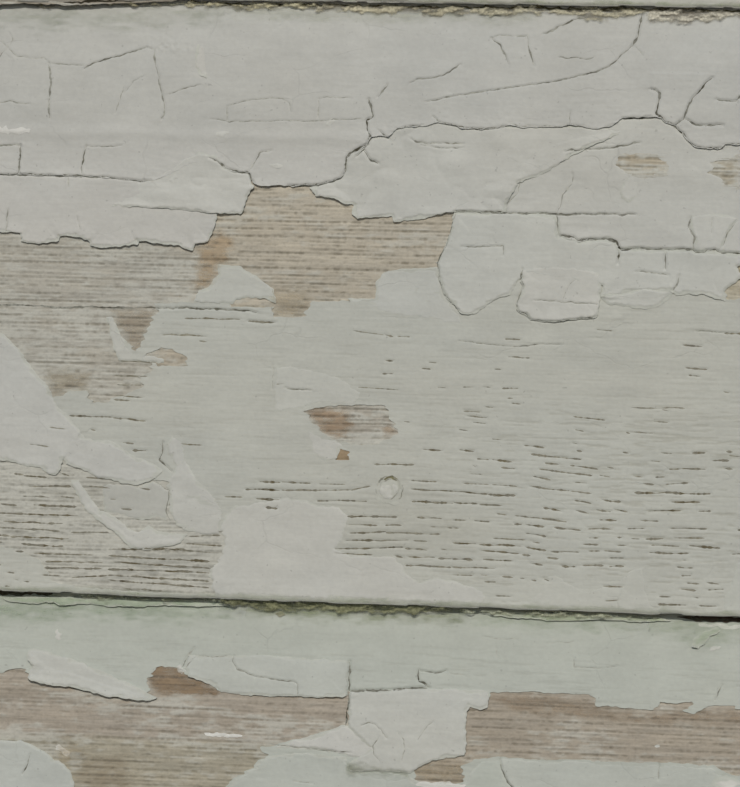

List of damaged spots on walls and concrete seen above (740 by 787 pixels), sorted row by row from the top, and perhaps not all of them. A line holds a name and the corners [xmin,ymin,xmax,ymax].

crack [0,144,151,187]
crack [0,33,196,119]
crack [209,16,740,187]
crack [437,179,740,309]
peeling [0,117,740,612]
crack [269,743,347,752]
peeling [0,655,740,787]